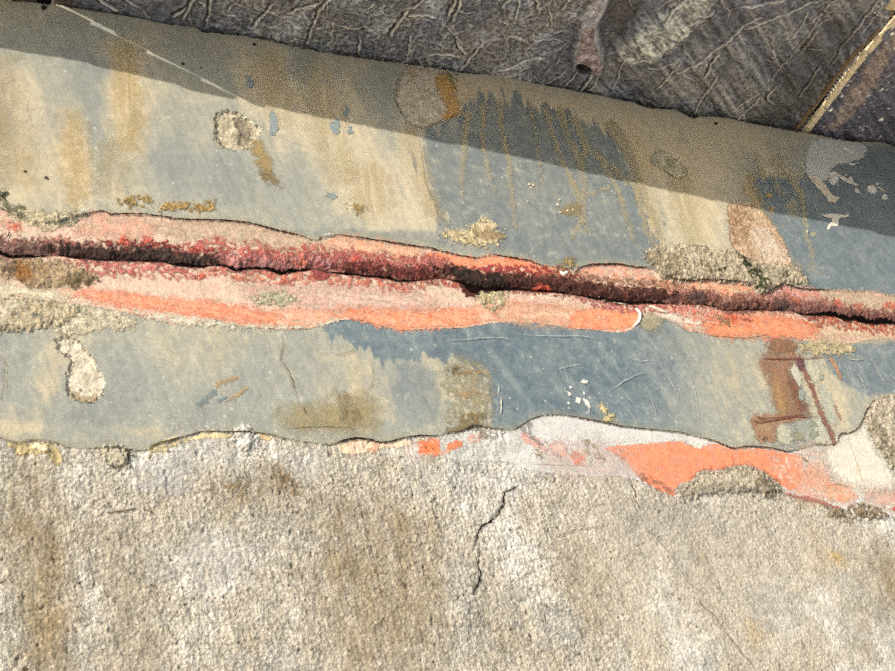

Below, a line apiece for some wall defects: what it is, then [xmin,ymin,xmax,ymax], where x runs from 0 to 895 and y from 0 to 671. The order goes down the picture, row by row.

spalling [394,64,464,129]
water stain [252,140,279,184]
water stain [460,98,512,186]
water stain [529,103,627,213]
peeling [805,139,888,203]
crack [0,231,423,282]
crack [76,210,544,266]
crack [445,277,671,318]
crack [791,310,895,324]
spalling [54,334,107,403]
rust [750,338,842,446]
peeling [337,379,895,523]